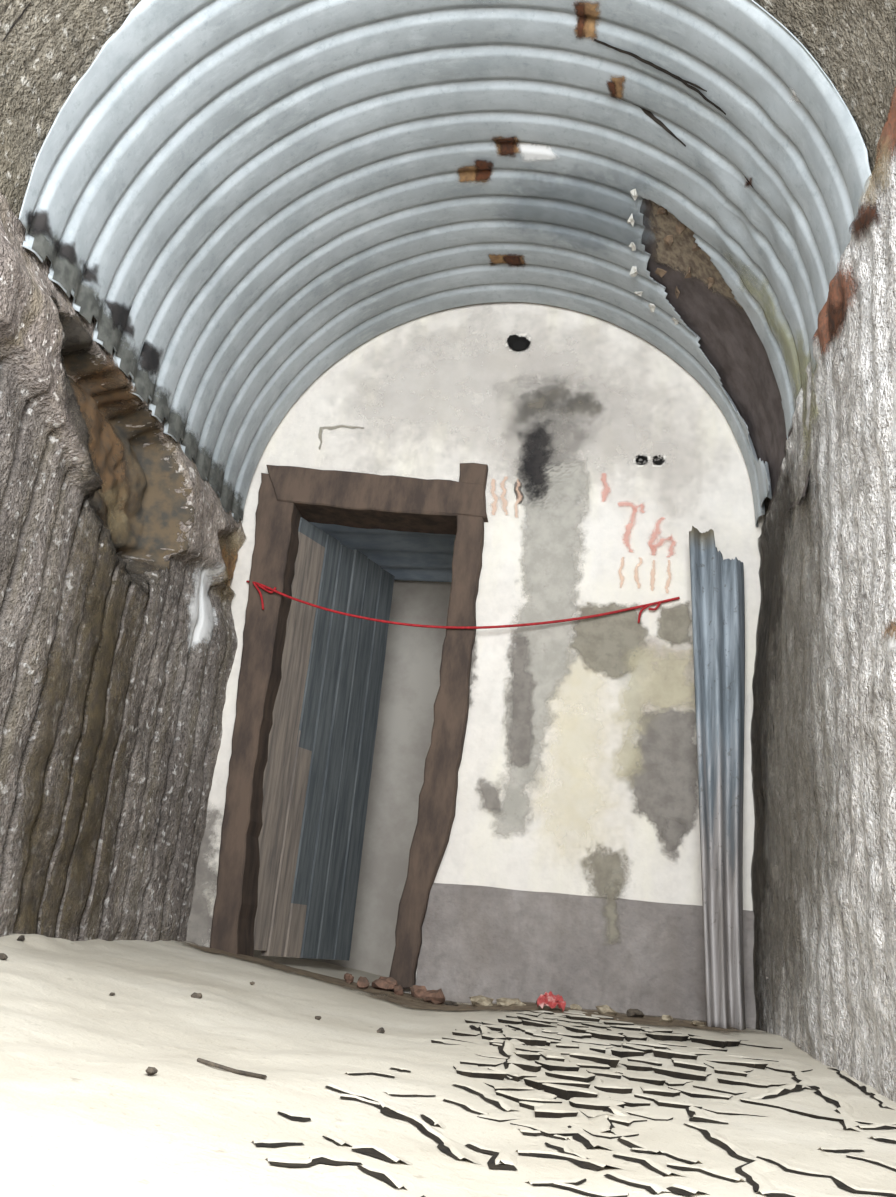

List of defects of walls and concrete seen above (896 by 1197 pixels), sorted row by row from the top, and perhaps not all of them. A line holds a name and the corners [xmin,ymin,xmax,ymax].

corrosion [574,2,600,39]
corrosion [607,76,625,100]
corrosion [458,137,555,182]
corrosion [489,254,525,266]
spalling [627,188,792,509]
spalling [52,297,195,595]
leakage [518,388,600,498]
peeling [477,461,692,835]
peeling [627,709,698,858]
crack [251,1110,435,1197]
crack [325,1024,896,1197]